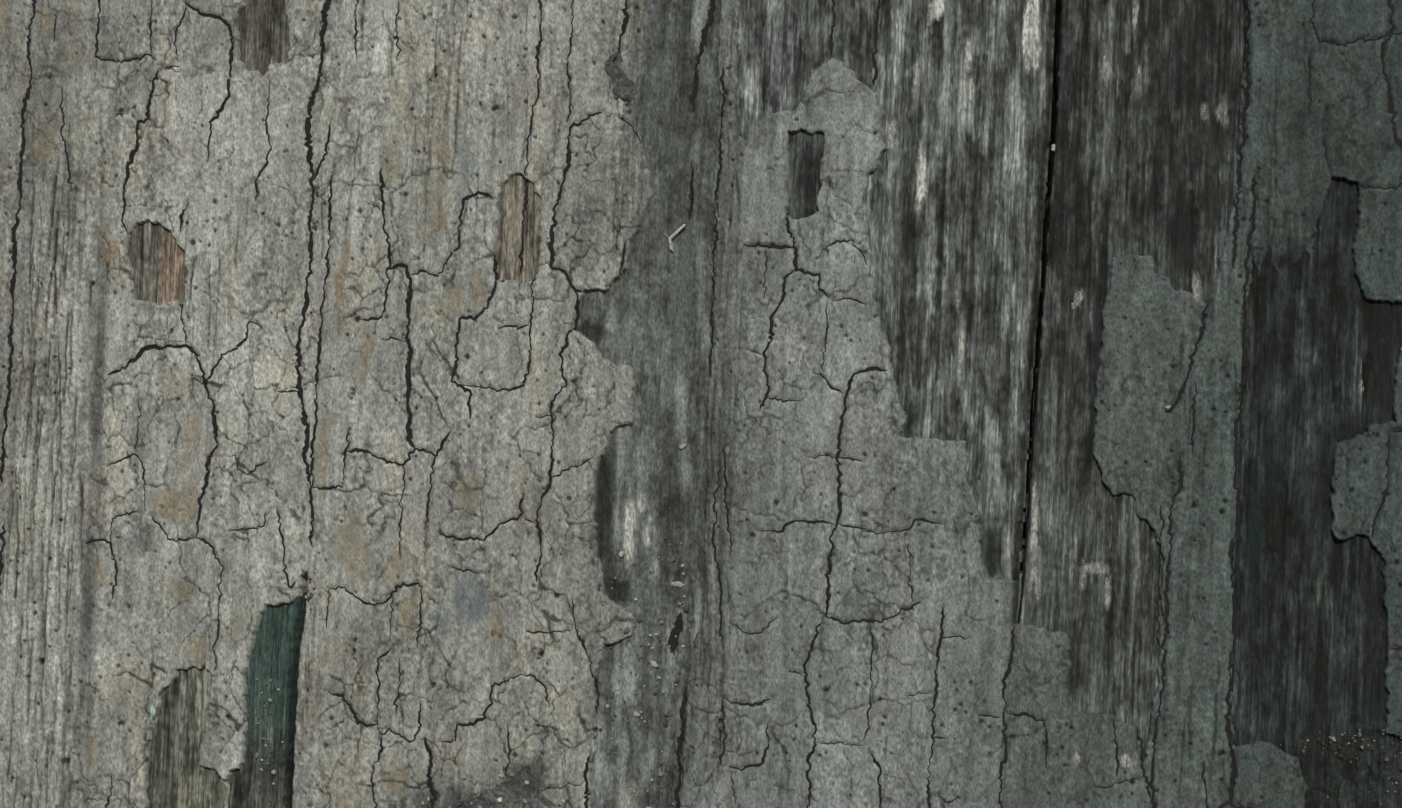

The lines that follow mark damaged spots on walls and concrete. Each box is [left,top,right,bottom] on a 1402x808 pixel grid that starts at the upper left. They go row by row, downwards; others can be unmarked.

crack [0,0,72,482]
peeling [128,221,188,305]
peeling [146,592,308,808]
peeling [236,0,290,76]
crack [83,0,641,808]
peeling [574,0,722,808]
crack [673,690,687,808]
crack [688,0,971,808]
peeling [737,0,1245,761]
crack [978,621,1049,808]
peeling [1232,179,1402,808]
crack [1308,0,1402,190]